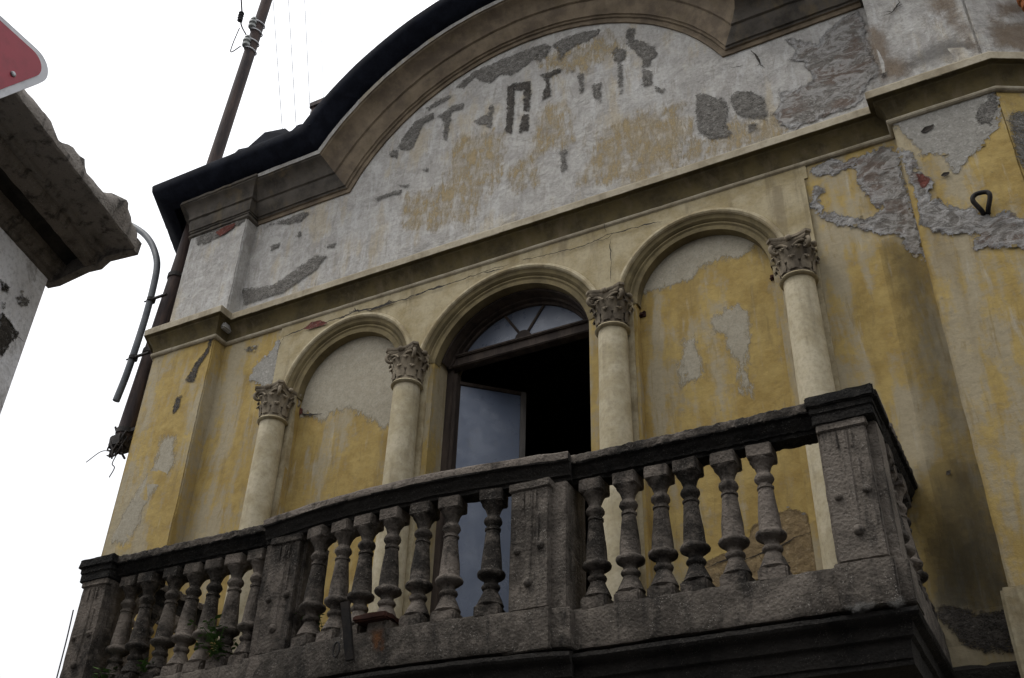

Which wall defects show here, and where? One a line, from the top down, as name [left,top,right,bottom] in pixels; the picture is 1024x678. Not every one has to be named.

flaking render [389,29,602,159]
flaking render [612,28,665,94]
flaking render [695,10,886,140]
flaking render [809,92,1024,262]
flaking render [196,219,245,245]
flaking render [267,211,308,237]
flaking render [0,279,30,356]
flaking render [242,243,337,305]
crack [278,222,657,350]
flaking render [185,339,213,382]
flaking render [936,604,1014,655]